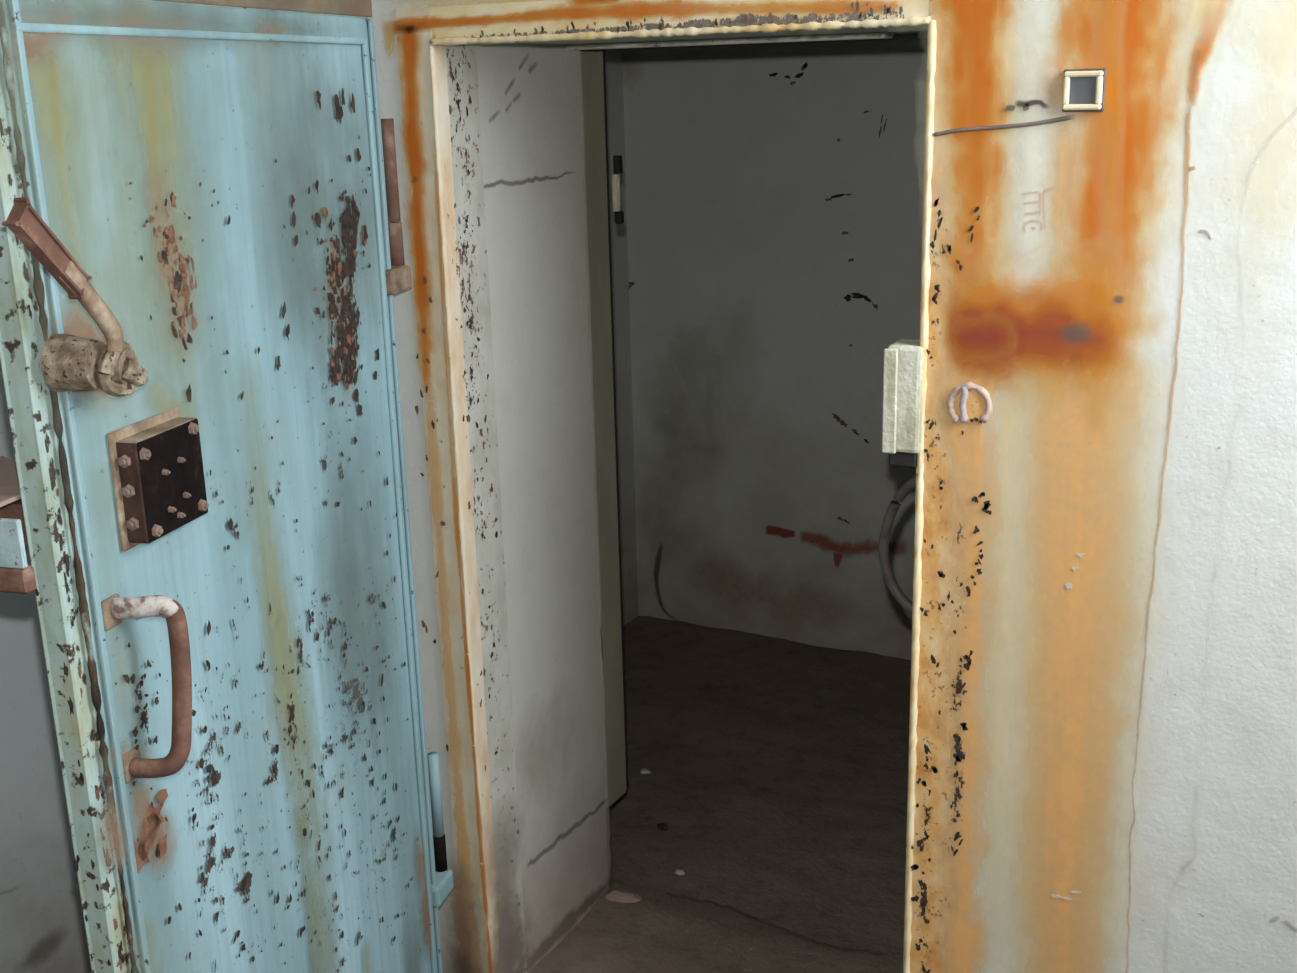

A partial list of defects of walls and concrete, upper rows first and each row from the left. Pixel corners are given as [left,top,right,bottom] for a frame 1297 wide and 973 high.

corrosion [23,22,63,62]
corrosion [63,311,106,345]
corrosion [159,198,185,328]
corrosion [384,0,904,973]
corrosion [939,0,1227,973]
crack [667,893,883,955]